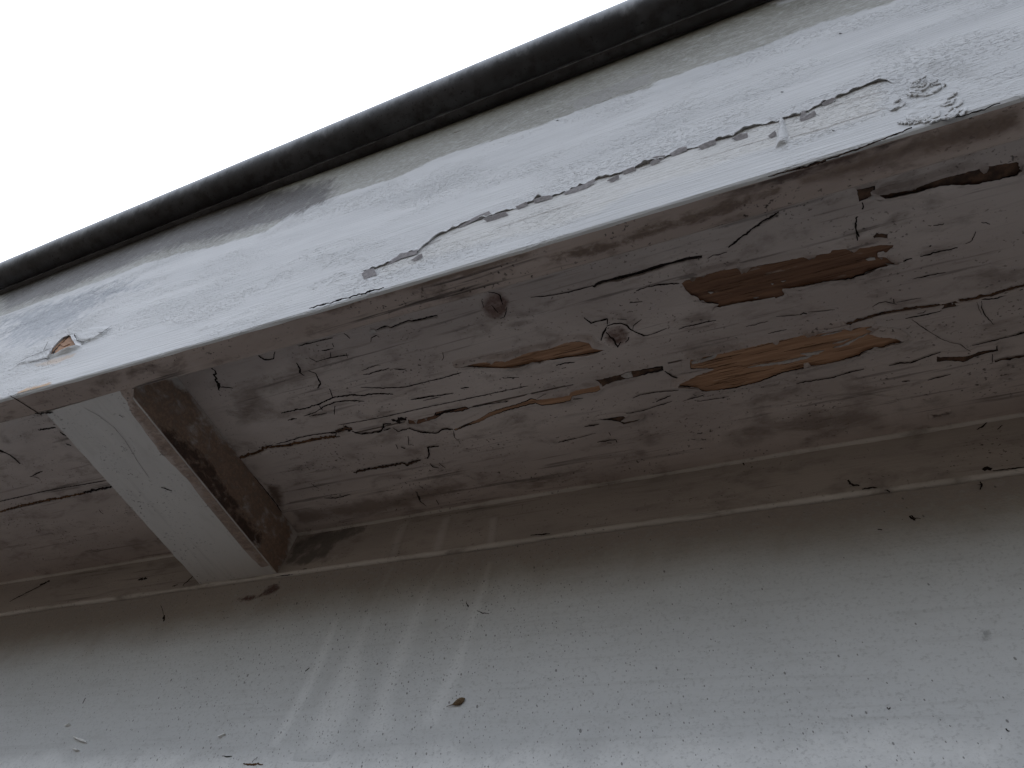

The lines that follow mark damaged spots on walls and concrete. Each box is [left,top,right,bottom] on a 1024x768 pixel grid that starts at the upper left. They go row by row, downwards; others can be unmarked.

crack [309,287,384,309]
peeling [362,75,904,280]
crack [531,210,784,348]
peeling [636,151,1024,313]
crack [746,222,1024,362]
crack [211,368,230,390]
crack [237,311,546,511]
peeling [405,320,913,442]
crack [634,390,724,402]
crack [797,369,863,384]
crack [0,447,112,514]
leakage [0,343,1024,768]